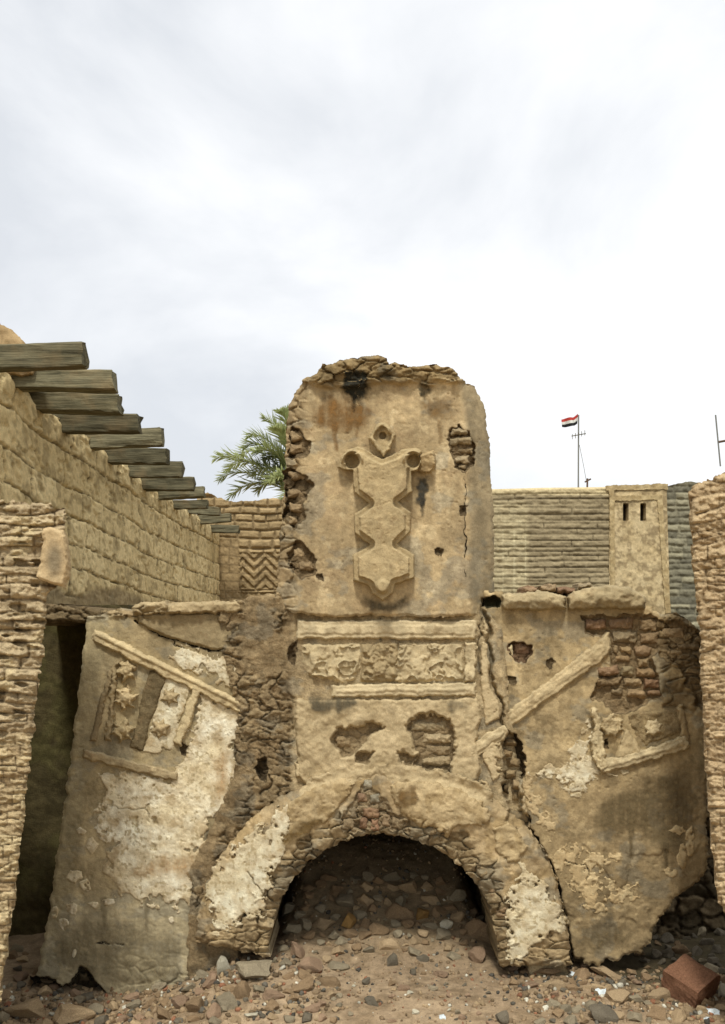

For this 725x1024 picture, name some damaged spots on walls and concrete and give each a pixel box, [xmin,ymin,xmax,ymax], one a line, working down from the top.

spalling [282,425,324,581]
leakage [318,395,370,450]
leakage [416,479,429,507]
spalling [447,424,476,473]
spalling [580,613,703,714]
peeling [51,642,239,930]
spalling [331,722,390,764]
spalling [399,713,455,773]
peeling [478,595,640,917]
peeling [204,804,290,937]
peeling [503,861,568,964]
crack [531,830,588,964]